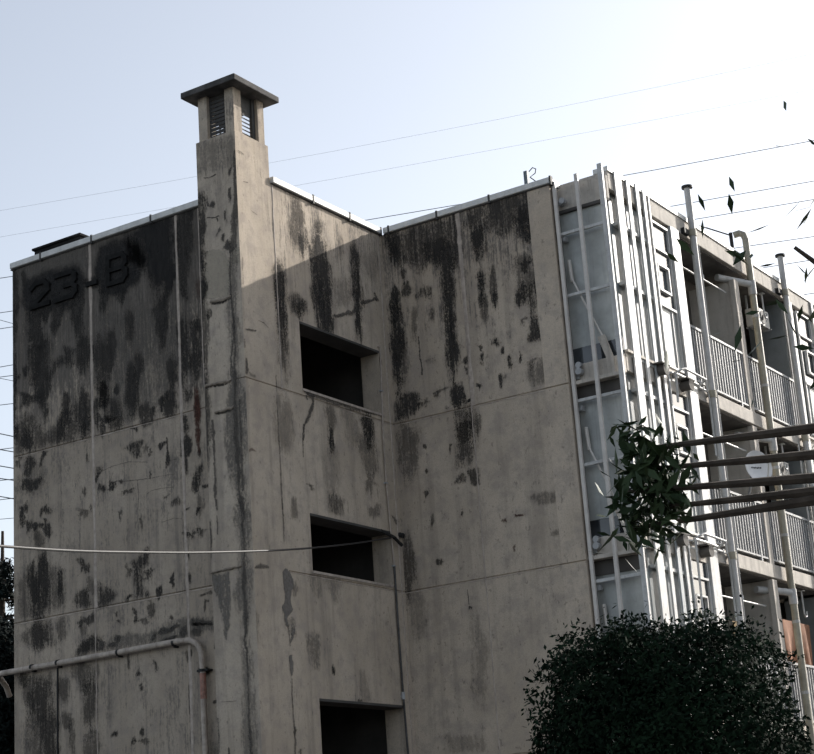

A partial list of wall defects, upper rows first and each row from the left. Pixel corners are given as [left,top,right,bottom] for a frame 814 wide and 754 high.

water stain [12,192,228,494]
water stain [273,195,335,371]
water stain [350,244,365,343]
water stain [384,192,531,421]
water stain [515,258,541,342]
corrosion [193,388,201,451]
water stain [455,416,480,486]
water stain [24,551,63,651]
water stain [77,636,99,655]
water stain [75,582,114,627]
water stain [126,547,155,624]
water stain [82,679,98,726]